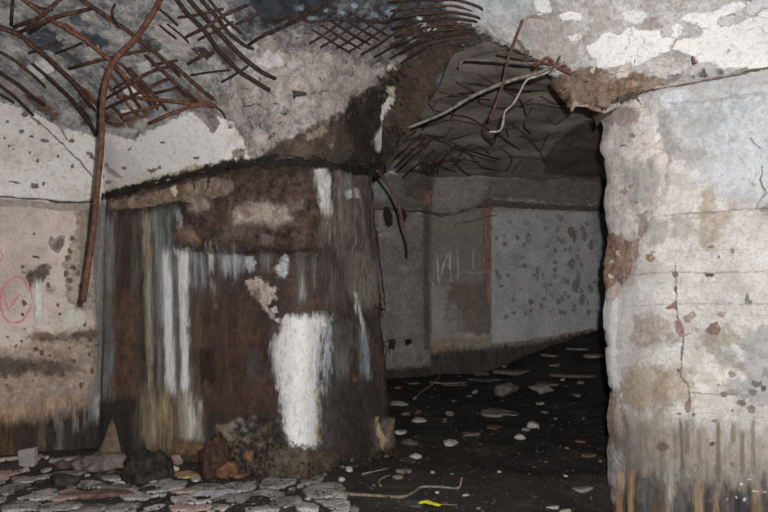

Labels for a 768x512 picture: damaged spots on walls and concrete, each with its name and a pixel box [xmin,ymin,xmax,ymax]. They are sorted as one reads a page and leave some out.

corrosion [23,95,59,120]
spalling [0,0,408,340]
damp [0,0,607,456]
peeling [443,0,768,449]
crack [666,265,694,413]
damp [607,364,768,512]